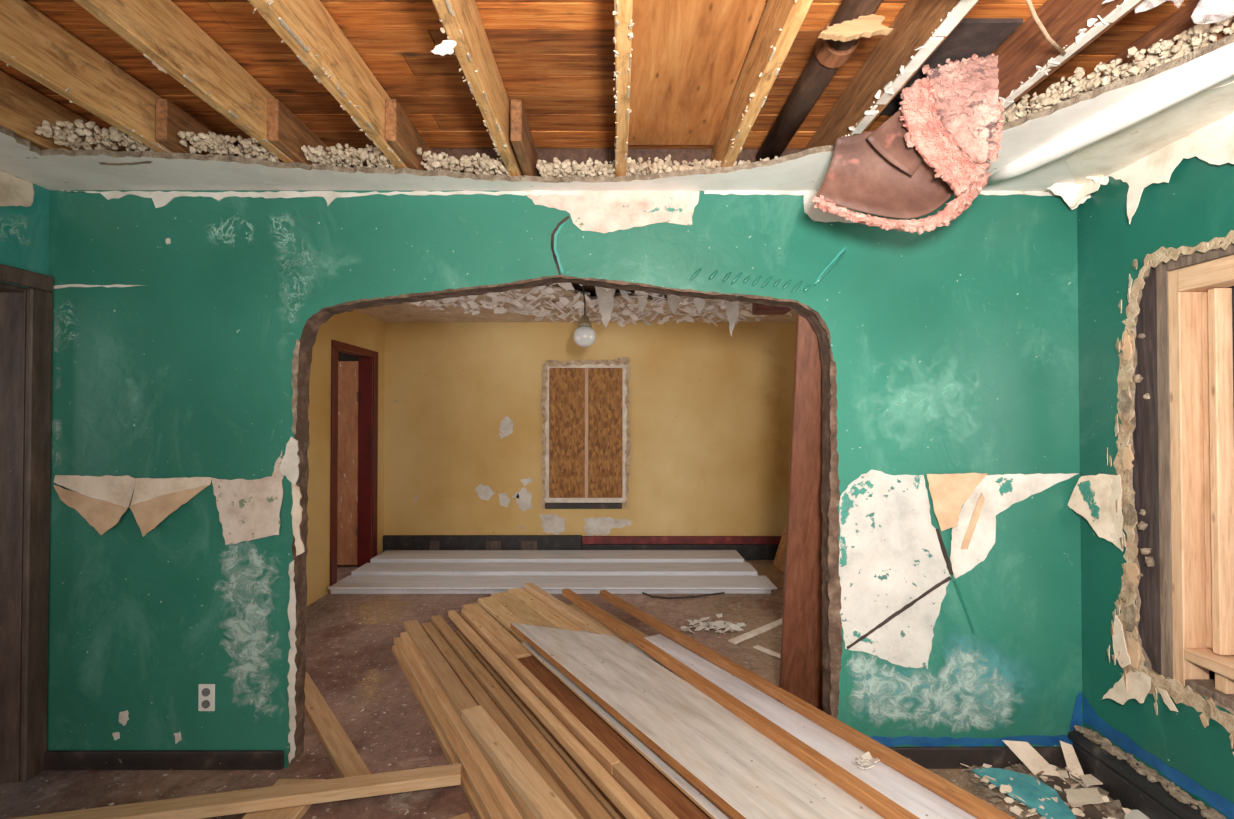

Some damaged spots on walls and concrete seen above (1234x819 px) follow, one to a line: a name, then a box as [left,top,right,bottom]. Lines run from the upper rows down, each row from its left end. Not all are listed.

peeling [980,44,1234,224]
peeling [0,170,34,243]
peeling [209,217,252,244]
peeling [53,190,862,233]
flaking render [217,216,1023,764]
flaking render [1067,230,1234,755]
flaking render [112,710,129,741]